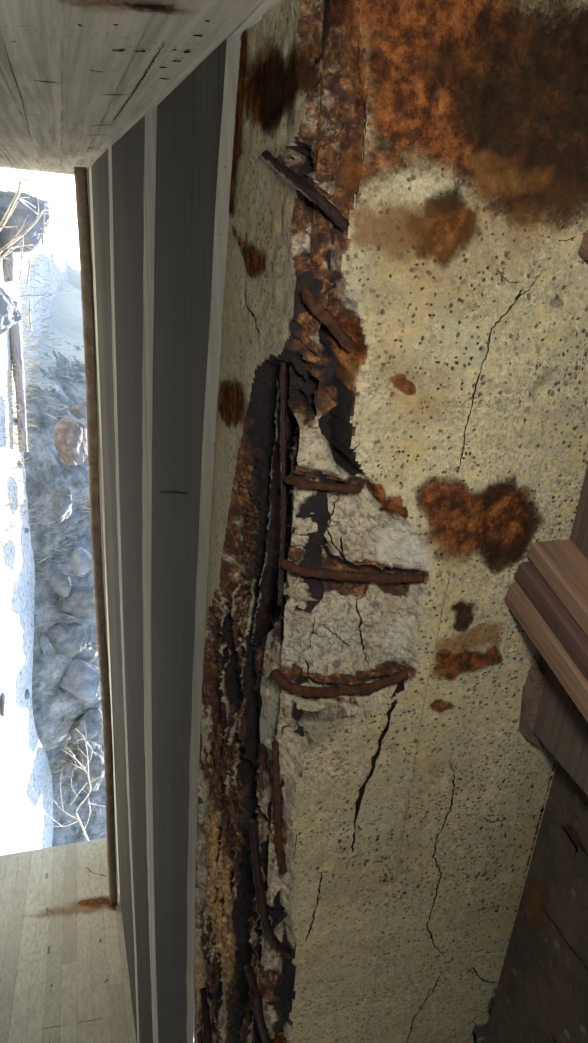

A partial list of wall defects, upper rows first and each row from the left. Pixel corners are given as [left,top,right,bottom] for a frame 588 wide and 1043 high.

corrosion [229,30,321,216]
corrosion [328,0,588,266]
corrosion [232,230,268,278]
corrosion [218,380,247,427]
corrosion [390,374,416,395]
crack [458,270,544,472]
spalling [195,0,432,1043]
corrosion [364,477,544,574]
corrosion [435,602,502,680]
crack [306,671,408,939]
crack [406,756,456,1043]